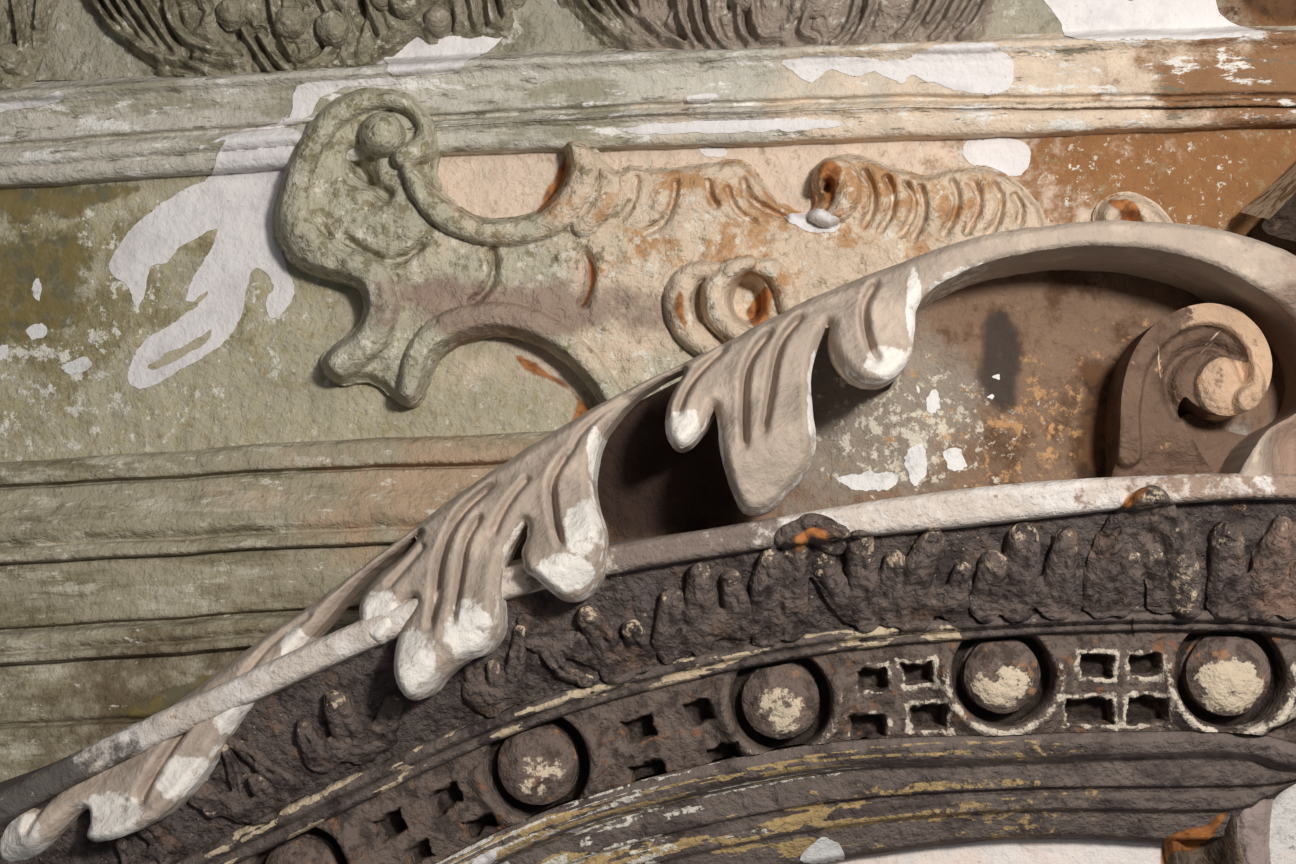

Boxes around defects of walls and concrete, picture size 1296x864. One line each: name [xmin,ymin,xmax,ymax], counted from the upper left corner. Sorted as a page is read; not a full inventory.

peeling [1044,0,1266,41]
peeling [781,42,1014,95]
peeling [622,93,841,157]
peeling [109,36,502,389]
corrosion [538,159,569,212]
corrosion [1109,199,1142,222]
corrosion [582,258,595,306]
corrosion [517,356,589,420]
peeling [472,850,497,864]
peeling [800,837,845,864]
spalling [1161,812,1226,864]